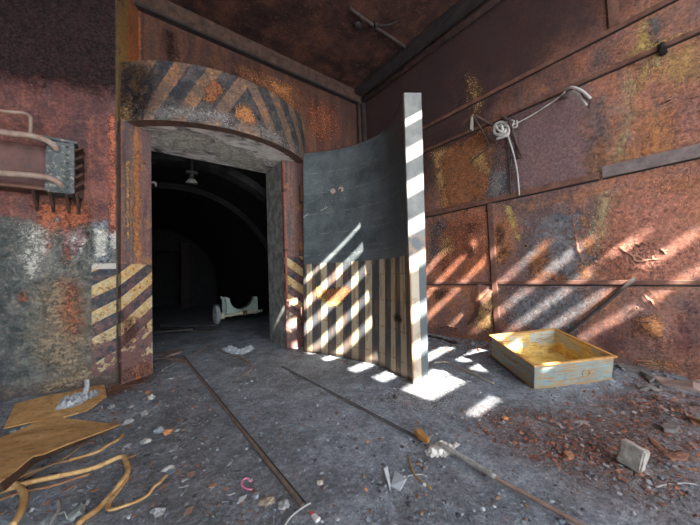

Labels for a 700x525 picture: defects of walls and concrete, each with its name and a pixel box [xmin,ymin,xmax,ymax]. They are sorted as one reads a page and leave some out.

rust [203,80,224,104]
rust [243,70,299,108]
rust [235,105,258,124]
rust [108,115,116,248]
rust [125,150,140,251]
rust [433,130,494,210]
rust [495,223,509,266]
rust [526,238,568,281]
rust [603,174,700,281]
rust [473,295,493,330]
rust [632,315,667,351]